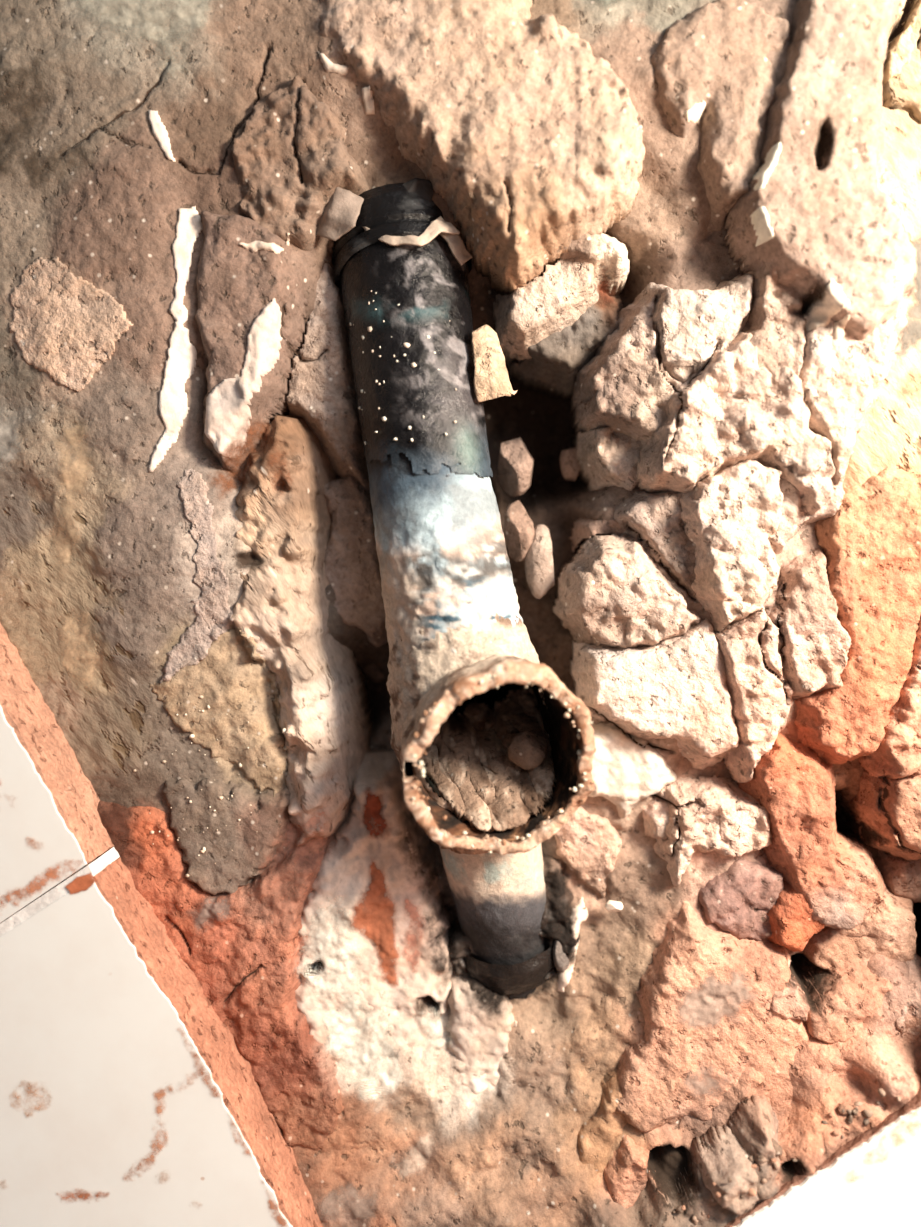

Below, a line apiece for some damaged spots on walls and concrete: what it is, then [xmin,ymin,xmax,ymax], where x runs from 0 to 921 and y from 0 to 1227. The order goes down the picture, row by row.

crack [887,0,921,48]
peeling [148,206,203,472]
peeling [204,298,283,458]
peeling [472,325,517,403]
crack [656,326,718,456]
crack [758,588,787,700]
rust [363,789,388,838]
spalling [97,800,344,1151]
damp [260,812,402,1111]
rust [351,862,423,985]
damp [426,855,577,1013]
damp [399,1134,433,1176]